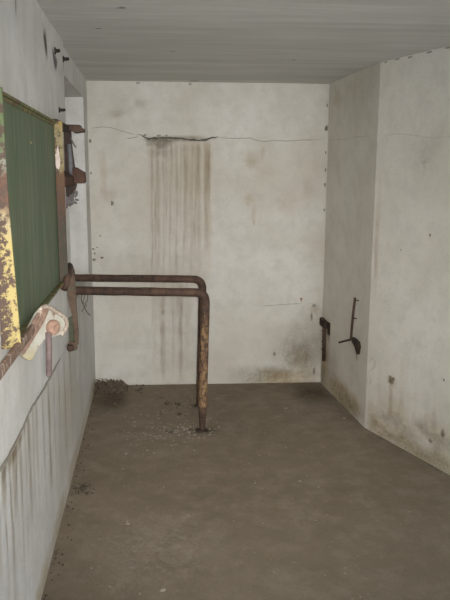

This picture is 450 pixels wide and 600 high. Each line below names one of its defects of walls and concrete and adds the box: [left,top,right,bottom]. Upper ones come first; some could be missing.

crack [90,126,368,142]